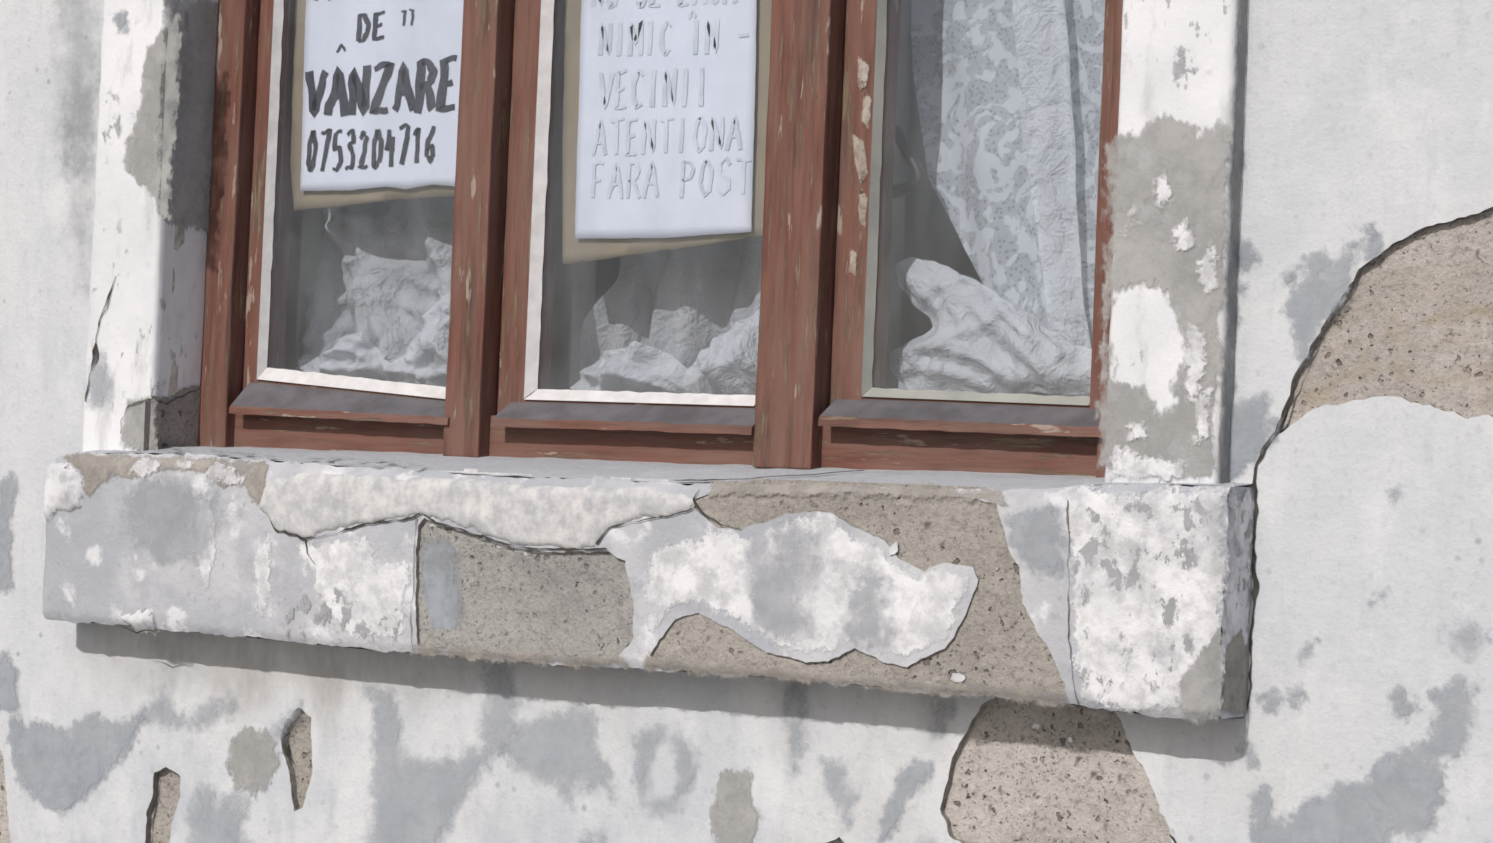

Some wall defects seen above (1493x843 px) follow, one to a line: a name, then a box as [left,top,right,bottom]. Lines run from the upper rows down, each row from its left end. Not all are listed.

peeling [102,0,218,233]
crack [85,276,116,406]
flaking render [64,386,426,588]
peeling [253,537,272,617]
crack [269,470,864,650]
flaking render [643,0,1493,843]
peeling [0,651,235,843]
peeling [147,709,312,843]
flaking render [285,519,634,843]